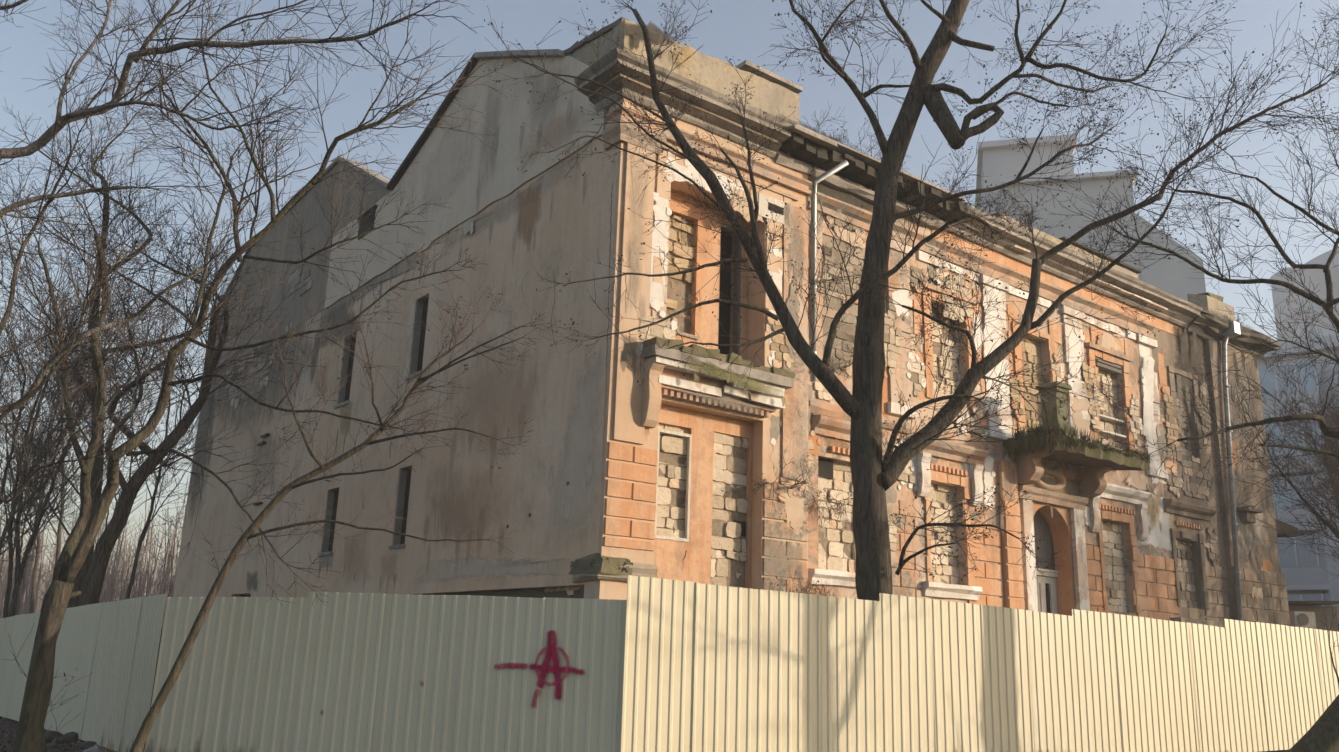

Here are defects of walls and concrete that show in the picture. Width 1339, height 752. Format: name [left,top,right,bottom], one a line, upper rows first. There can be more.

flaking render [639,151,866,482]
peeling [882,266,1025,451]
peeling [770,415,805,528]
flaking render [886,456,918,552]
peeling [961,453,1013,510]
flaking render [1204,527,1220,567]
peeling [1237,504,1273,572]
peeling [1252,586,1263,599]